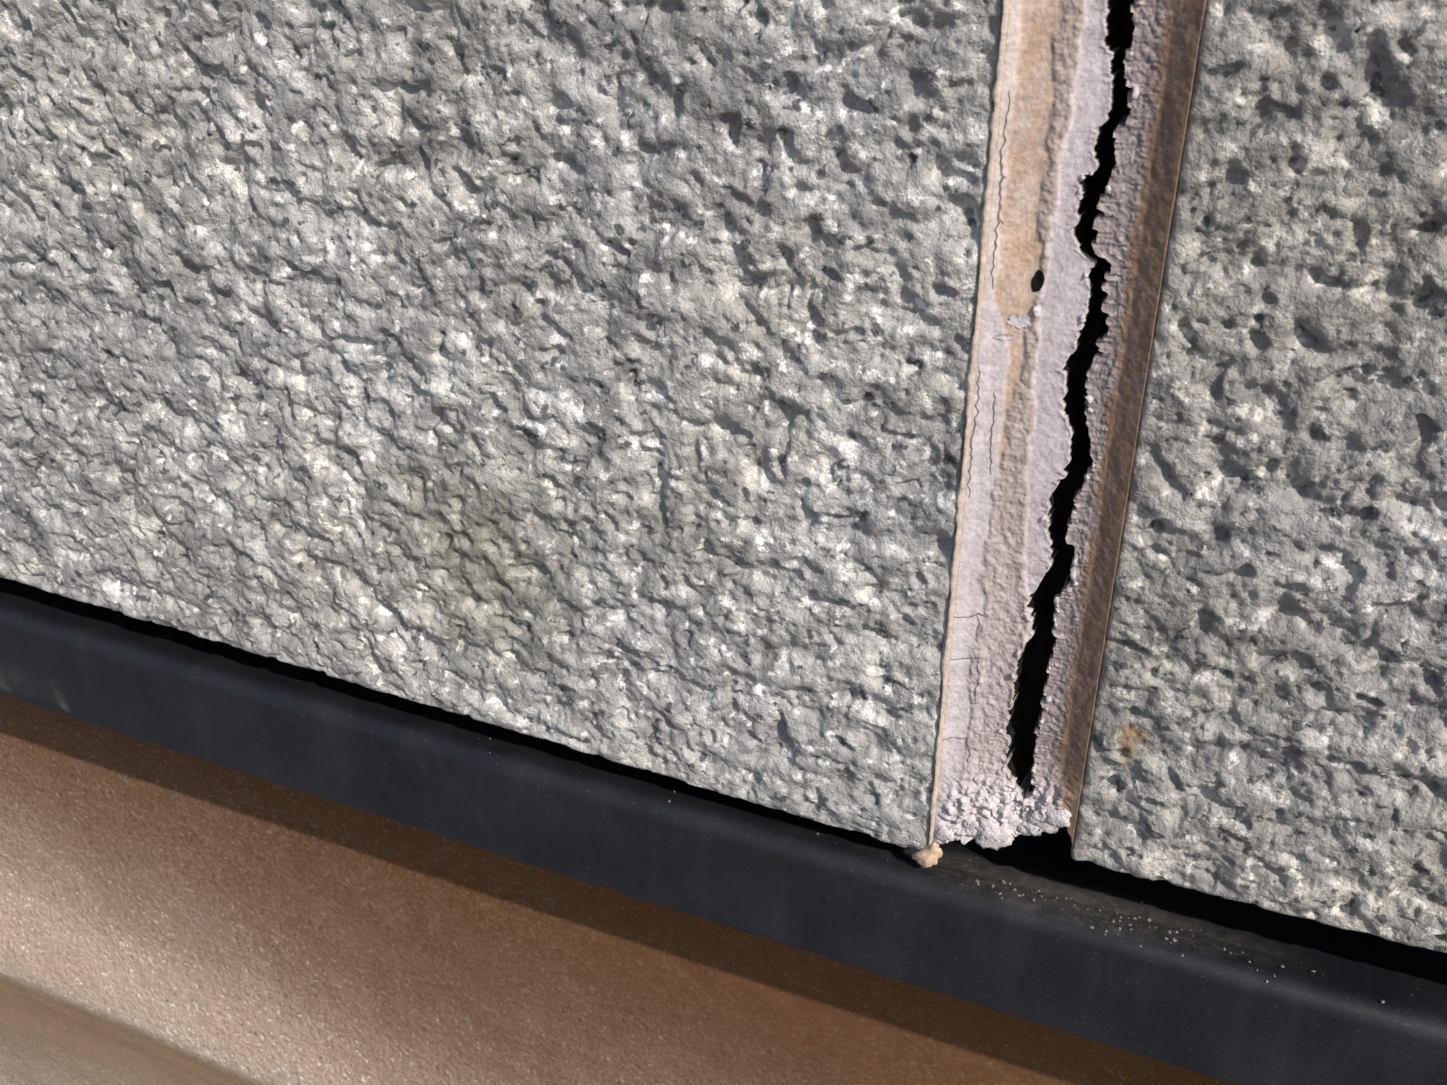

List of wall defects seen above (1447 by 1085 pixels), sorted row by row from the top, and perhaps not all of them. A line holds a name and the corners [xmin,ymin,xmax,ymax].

crack [942,0,1139,796]